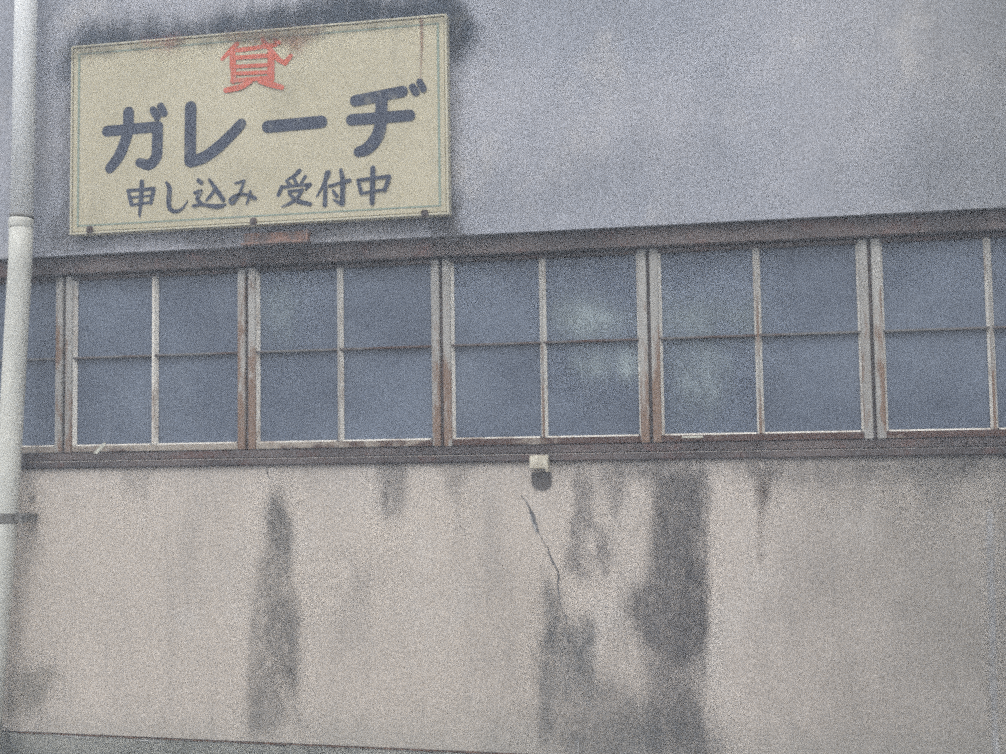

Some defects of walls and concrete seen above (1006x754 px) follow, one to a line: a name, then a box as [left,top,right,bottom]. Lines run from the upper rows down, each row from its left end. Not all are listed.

damp [67,0,469,64]
crack [521,496,569,674]
crack [17,732,515,754]